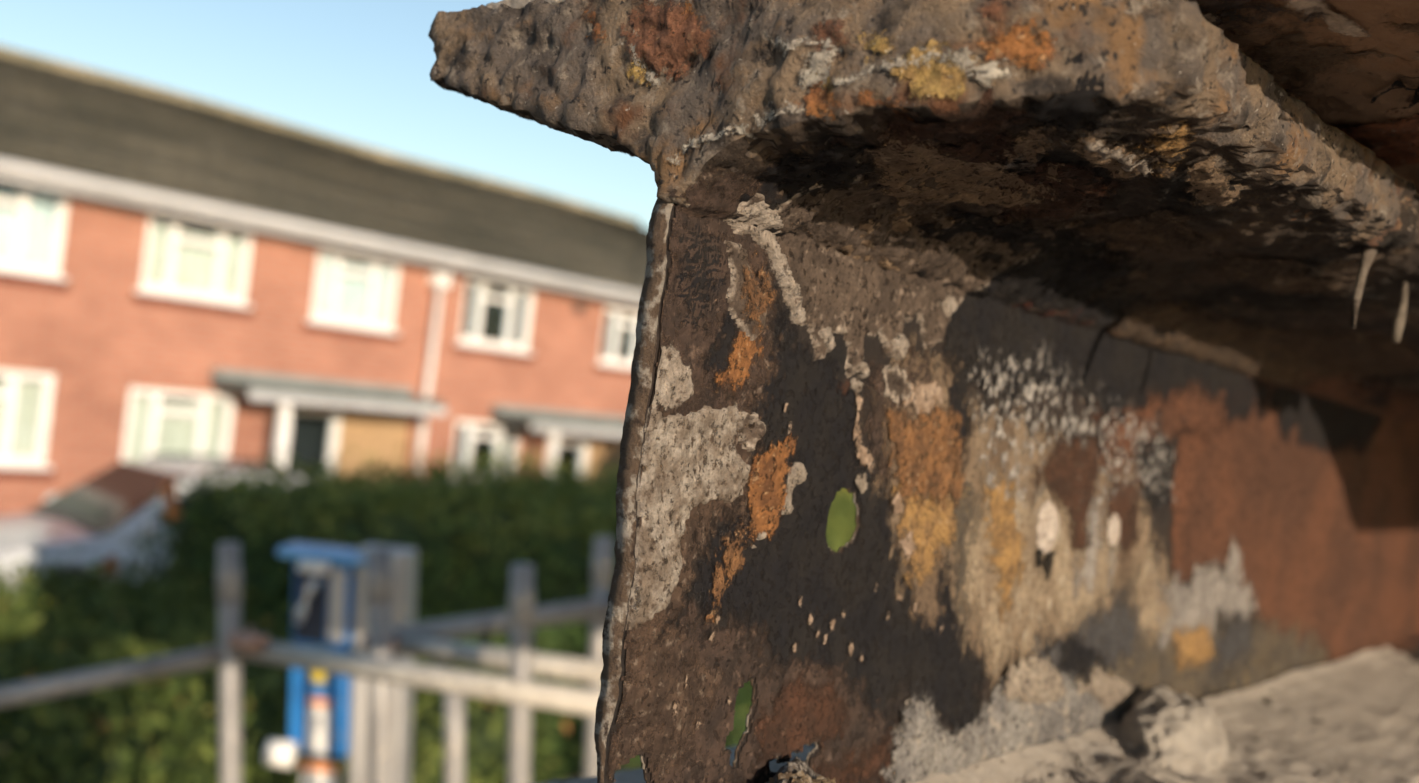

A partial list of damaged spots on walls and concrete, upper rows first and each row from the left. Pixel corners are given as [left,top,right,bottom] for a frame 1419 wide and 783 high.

corrosion [581,0,719,86]
corrosion [798,0,1057,133]
peeling [1074,120,1241,206]
spalling [1331,107,1419,168]
peeling [727,200,836,353]
peeling [652,344,694,411]
peeling [850,332,913,407]
peeling [736,411,766,452]
corrosion [607,161,929,783]
peeling [855,473,868,494]
corrosion [861,348,1141,632]
corrosion [1068,768,1161,783]